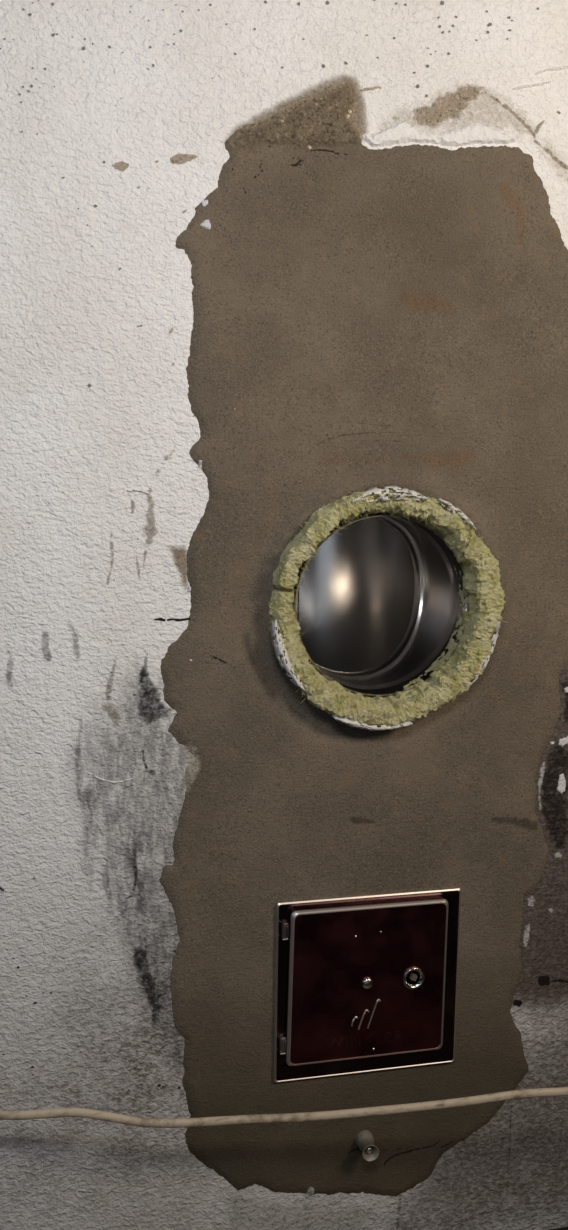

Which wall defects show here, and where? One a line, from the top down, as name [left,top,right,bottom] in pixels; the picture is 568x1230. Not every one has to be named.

peeling [360,47,568,169]
peeling [200,200,211,230]
damp [134,667,168,723]
peeling [557,774,566,794]
damp [134,950,161,1021]